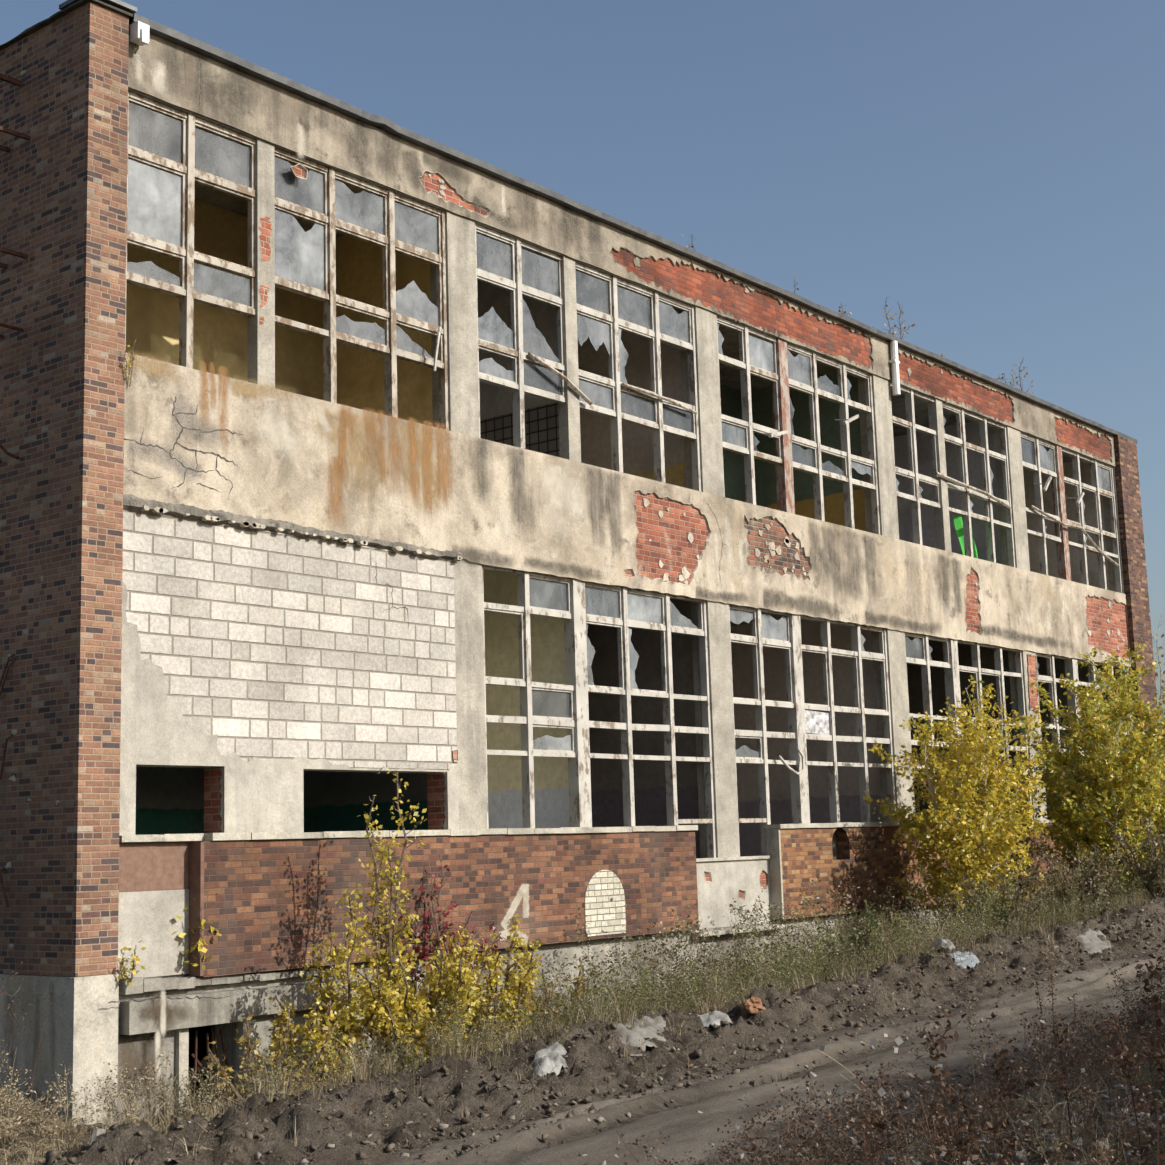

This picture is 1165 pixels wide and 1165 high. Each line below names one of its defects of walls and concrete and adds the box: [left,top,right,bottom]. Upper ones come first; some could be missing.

flaking render [418,170,492,218]
flaking render [609,246,874,369]
flaking render [898,350,1016,425]
crack [124,396,244,494]
rust [331,409,350,517]
rust [366,411,450,503]
flaking render [1054,416,1113,463]
spalling [123,494,463,561]
flaking render [624,489,712,586]
flaking render [744,514,812,581]
flaking render [965,566,983,636]
flaking render [1085,594,1130,660]